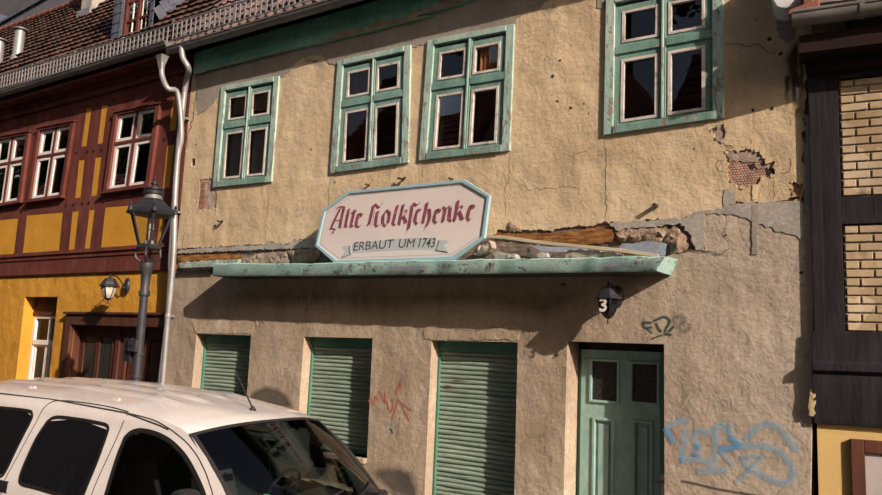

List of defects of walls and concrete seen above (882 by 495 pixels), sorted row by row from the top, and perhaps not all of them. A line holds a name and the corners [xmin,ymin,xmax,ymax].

spalling [711,125,775,190]
spalling [197,177,217,211]
crack [503,157,582,217]
crack [569,138,607,227]
spalling [790,180,803,197]
spalling [241,248,320,264]
spalling [615,226,689,254]